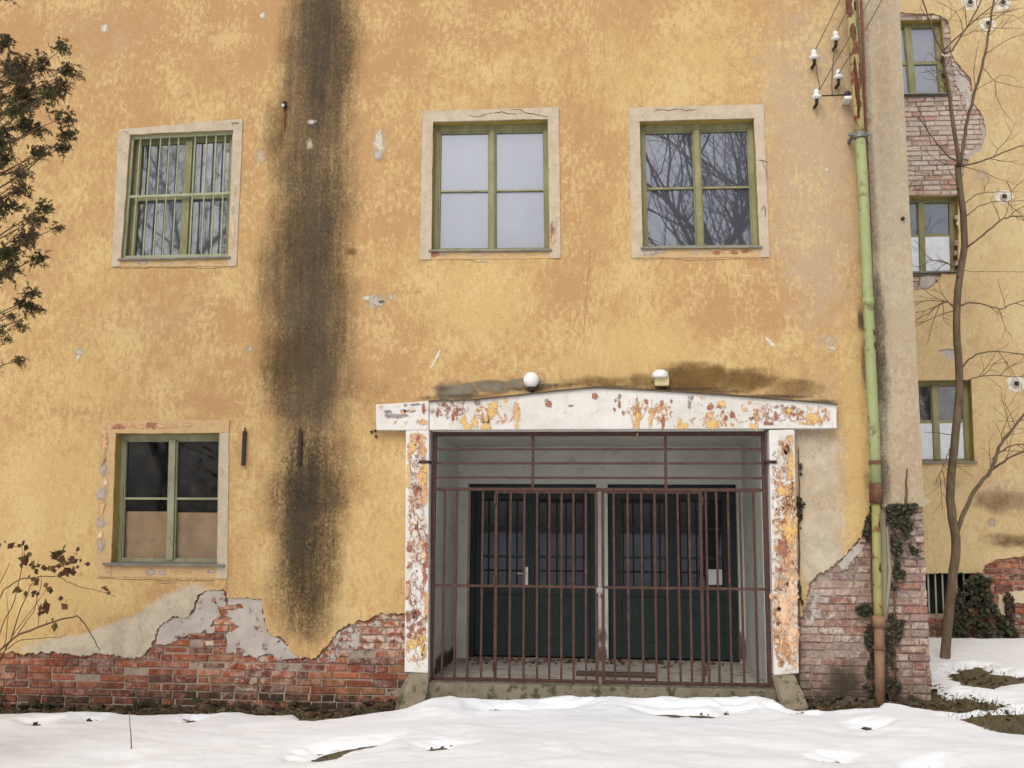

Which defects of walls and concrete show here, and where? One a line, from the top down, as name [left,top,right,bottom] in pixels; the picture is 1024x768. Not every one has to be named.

flaking render [900,12,986,196]
leakage [263,0,355,613]
flaking render [363,290,417,308]
flaking render [913,276,940,290]
leakage [437,378,556,400]
leakage [586,363,804,398]
flaking render [0,397,521,712]
flaking render [613,394,943,703]
flaking render [966,556,1024,638]